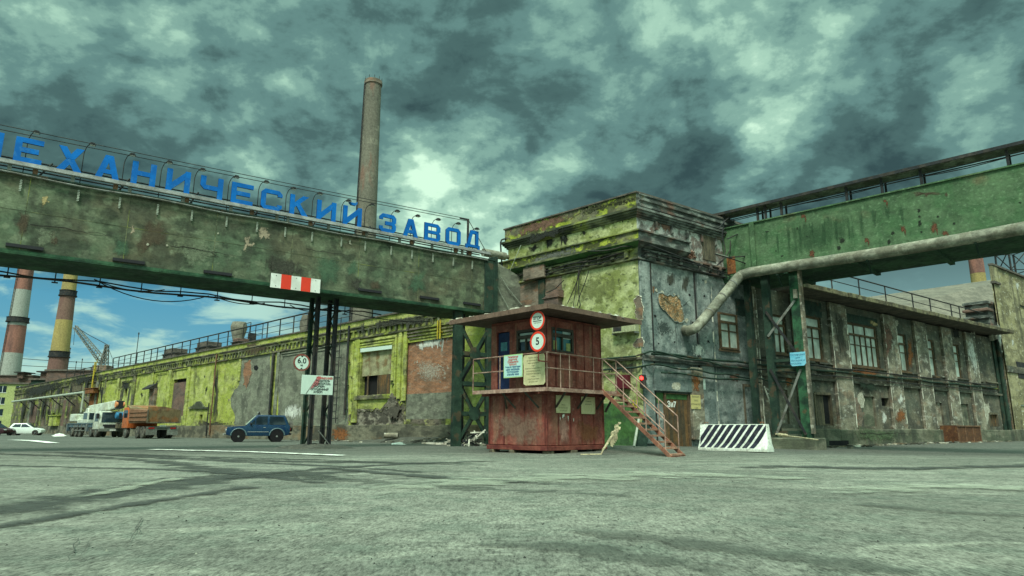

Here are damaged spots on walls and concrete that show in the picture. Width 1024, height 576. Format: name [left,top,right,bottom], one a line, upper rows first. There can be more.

leakage [266,256,302,275]
leakage [529,235,567,252]
flaking render [633,279,712,324]
flaking render [228,338,406,426]